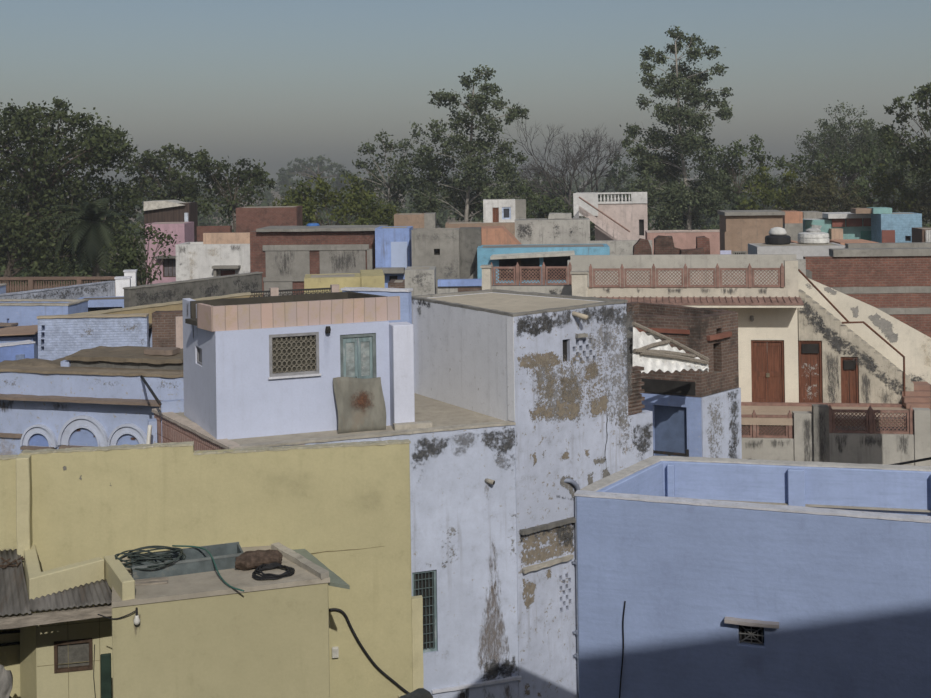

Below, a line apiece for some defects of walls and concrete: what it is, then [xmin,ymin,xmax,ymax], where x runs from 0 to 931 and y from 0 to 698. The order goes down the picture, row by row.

peeling [517,318,632,453]
water stain [799,301,923,403]
water stain [412,427,517,468]
water stain [479,543,517,698]
peeling [522,579,536,609]
peeling [511,523,574,578]